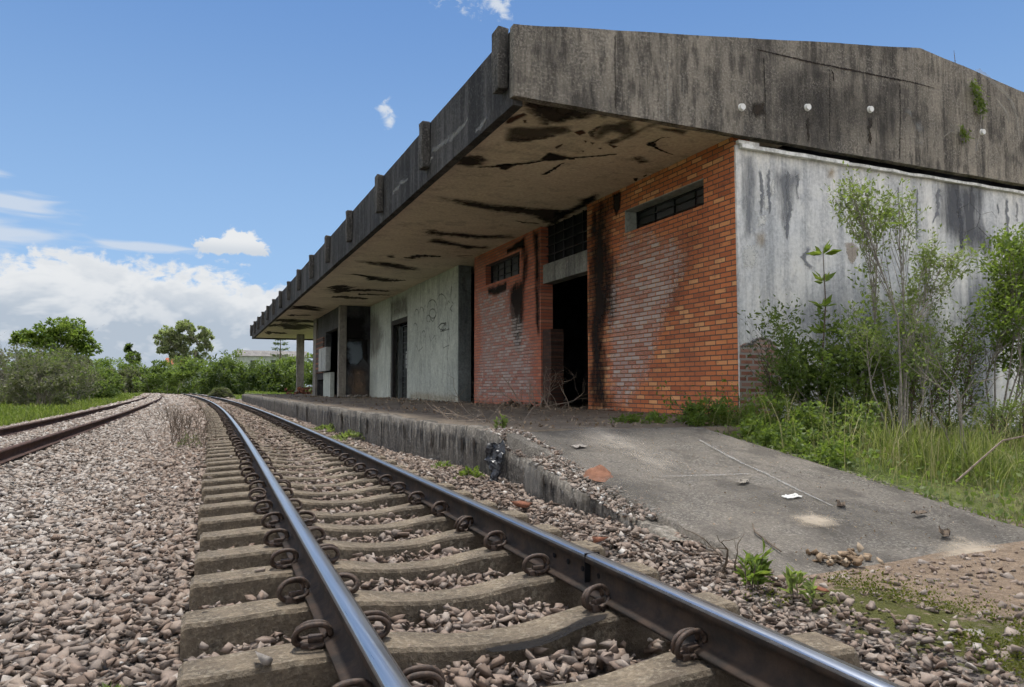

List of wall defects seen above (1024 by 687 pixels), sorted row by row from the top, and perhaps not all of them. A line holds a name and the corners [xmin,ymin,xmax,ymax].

leakage [457,156,486,166]
leakage [507,102,686,144]
crack [646,137,673,155]
leakage [752,103,765,116]
crack [757,49,933,158]
leakage [745,161,799,237]
leakage [933,183,991,251]
leakage [327,198,564,332]